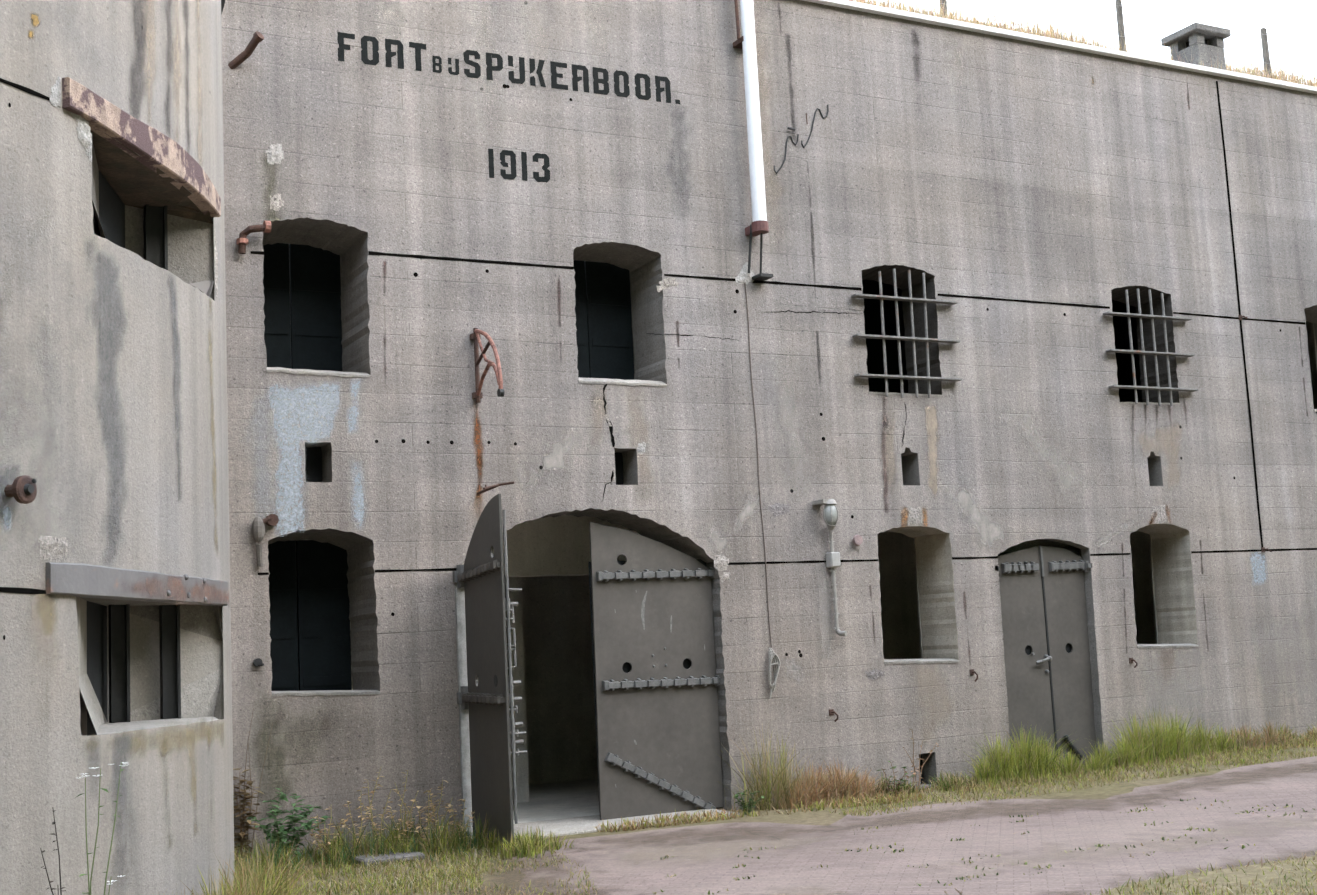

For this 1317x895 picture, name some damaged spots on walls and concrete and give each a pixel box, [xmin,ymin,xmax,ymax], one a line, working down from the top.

spalling [266,144,284,164]
damp [269,382,359,535]
damp [353,467,364,525]
corrosion [474,403,483,496]
crack [602,384,616,501]
spalling [38,535,69,563]